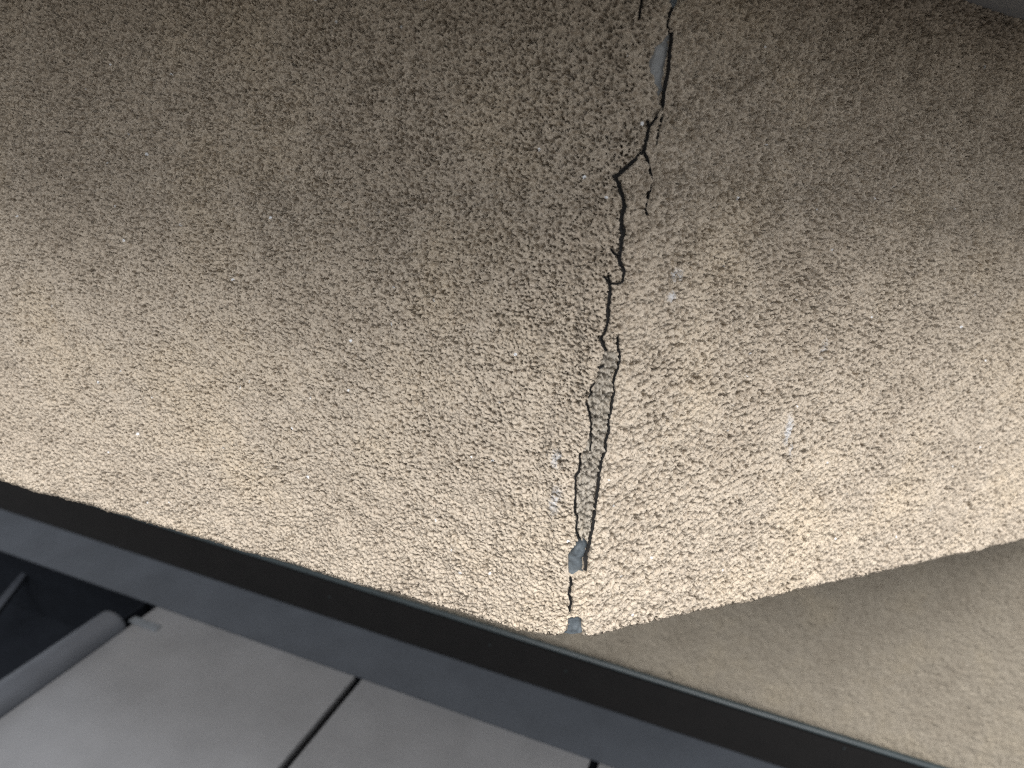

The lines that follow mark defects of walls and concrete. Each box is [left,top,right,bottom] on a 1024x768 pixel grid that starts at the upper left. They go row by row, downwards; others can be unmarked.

flaking render [618,34,670,263]
crack [568,8,674,614]
spalling [568,351,619,574]
spalling [564,605,589,634]